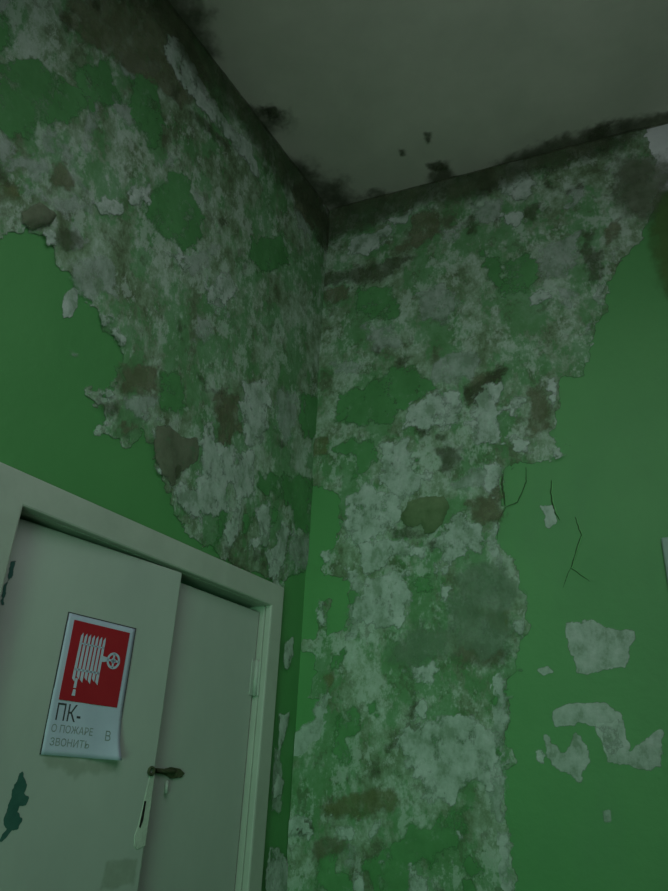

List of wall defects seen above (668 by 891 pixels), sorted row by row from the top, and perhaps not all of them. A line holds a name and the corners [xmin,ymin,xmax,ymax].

leakage [155,0,668,239]
peeling [0,0,328,587]
peeling [1,561,16,605]
peeling [265,129,664,891]
crack [497,474,527,534]
crack [550,480,589,587]